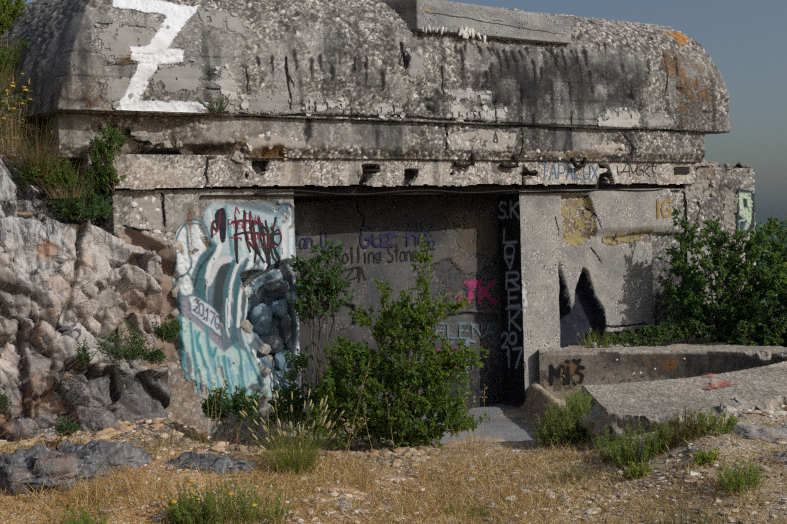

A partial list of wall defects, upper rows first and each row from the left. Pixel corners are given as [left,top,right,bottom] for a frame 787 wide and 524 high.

leakage [311,53,335,81]
leakage [479,43,642,119]
spalling [94,123,312,180]
leakage [301,100,329,144]
spalling [445,88,638,189]
peeling [598,107,676,129]
spalling [357,164,378,186]
spalling [402,169,417,186]